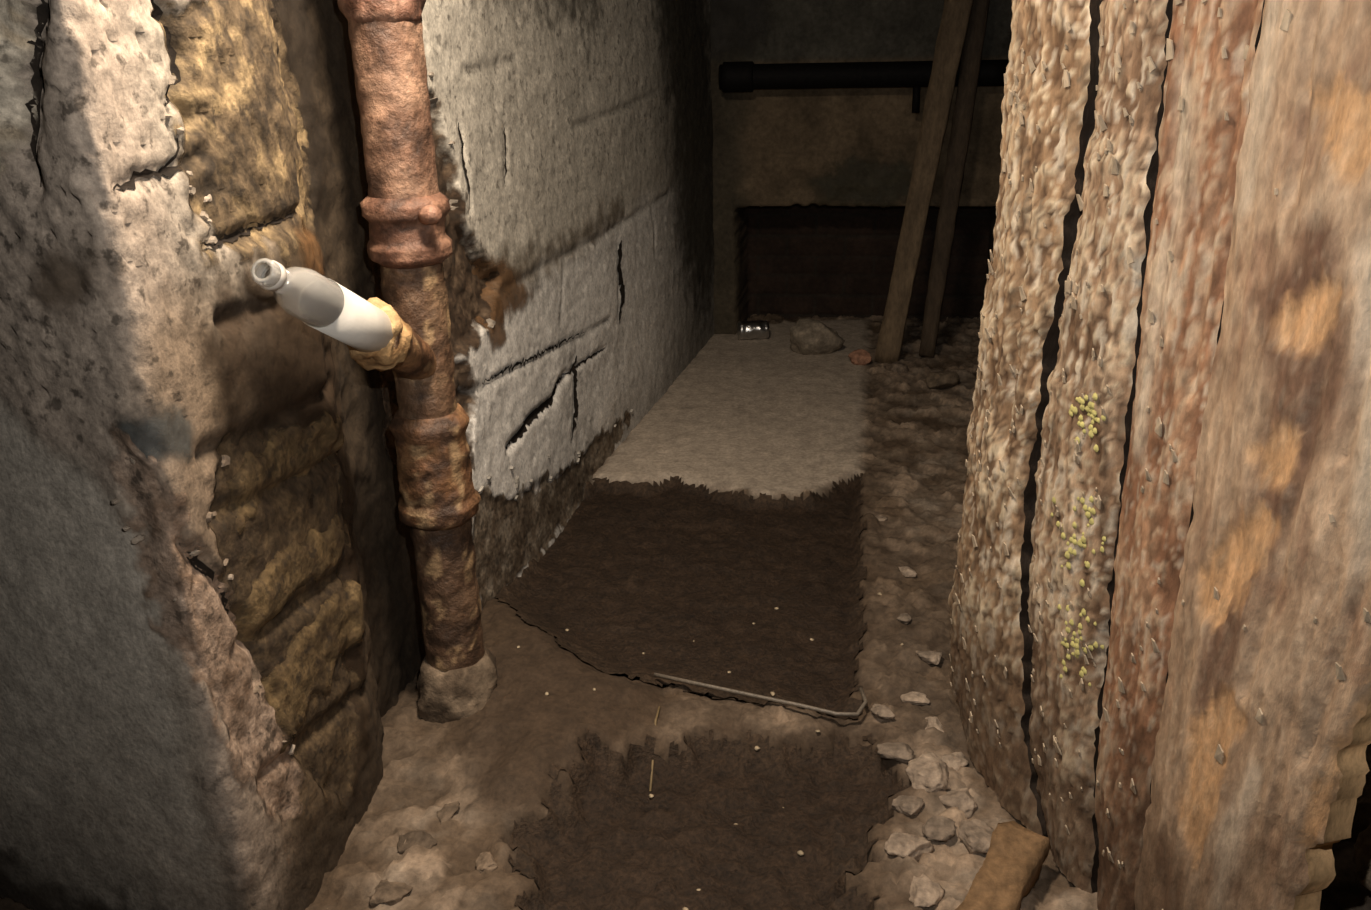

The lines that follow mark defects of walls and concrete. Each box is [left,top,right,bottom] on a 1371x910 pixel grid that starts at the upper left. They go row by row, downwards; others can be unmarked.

crack [25,0,50,187]
crack [113,138,184,191]
crack [150,0,181,104]
spalling [151,0,315,268]
spalling [368,259,385,302]
spalling [378,369,399,467]
peeling [428,72,634,609]
crack [482,240,625,449]
spalling [109,410,366,822]